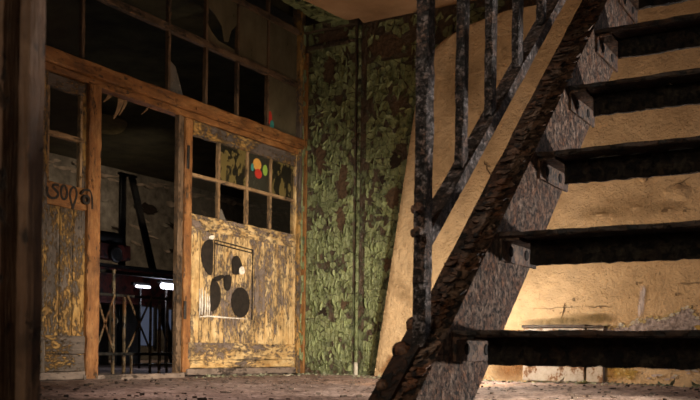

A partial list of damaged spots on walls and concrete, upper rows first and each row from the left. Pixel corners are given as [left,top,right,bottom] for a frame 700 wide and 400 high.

spalling [604,306,700,331]